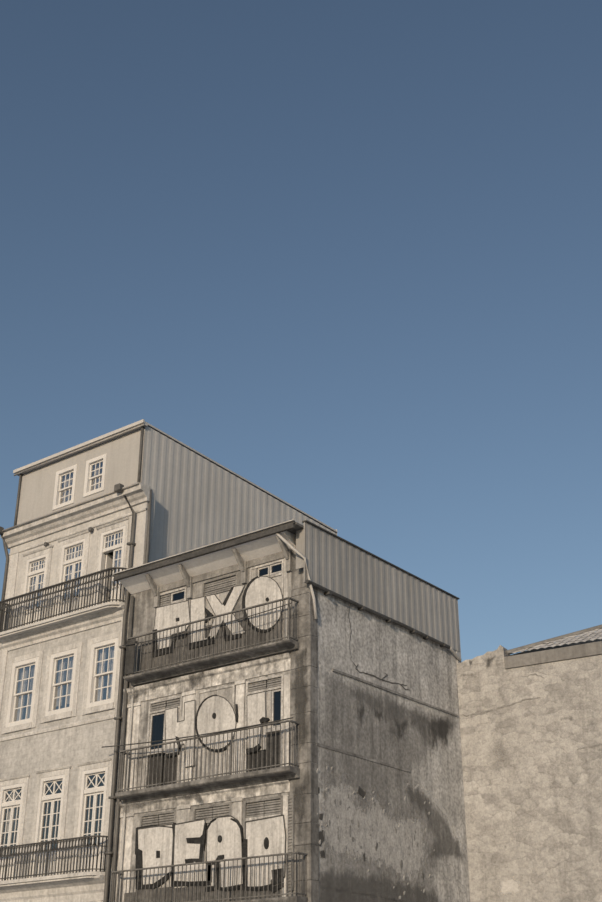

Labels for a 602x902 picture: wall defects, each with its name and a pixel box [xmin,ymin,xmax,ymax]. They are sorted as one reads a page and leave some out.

crack [348,604,409,690]
damp [357,691,450,744]
damp [320,874,437,902]